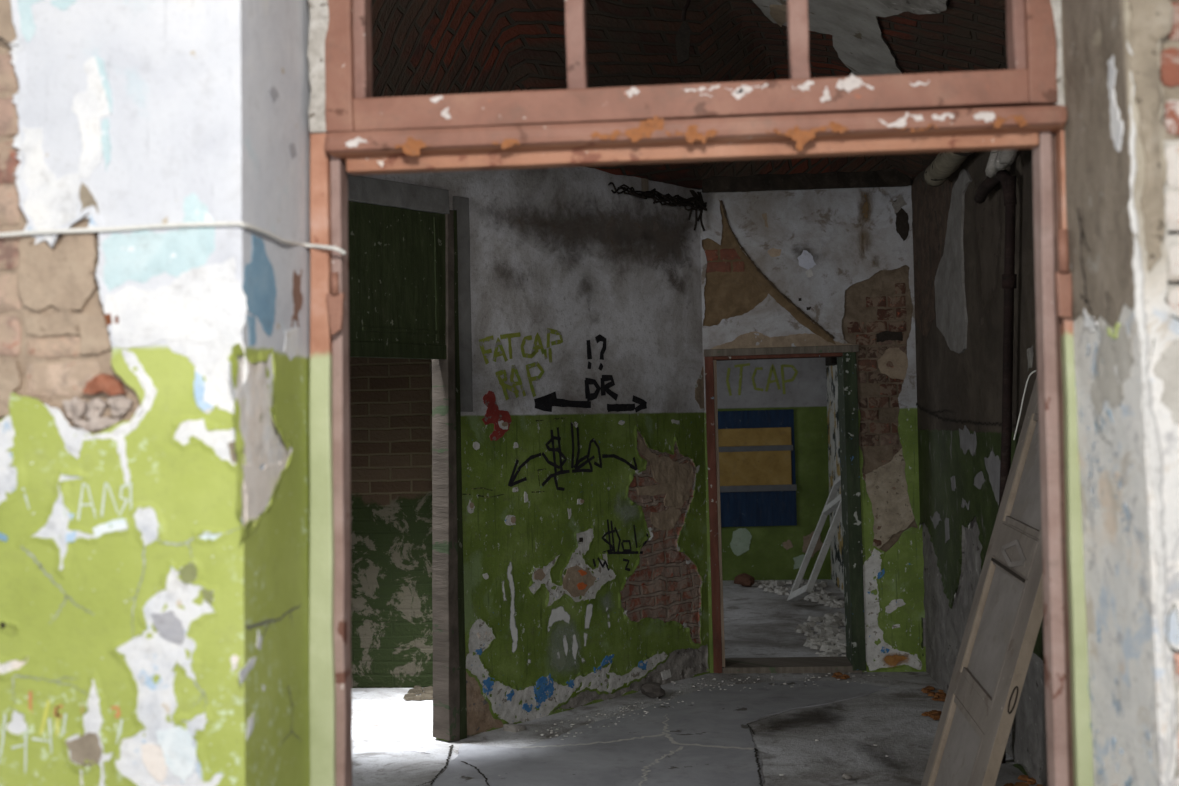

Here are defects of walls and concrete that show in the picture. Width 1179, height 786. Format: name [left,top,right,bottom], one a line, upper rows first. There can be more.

flaking render [1159,0,1179,320]
flaking render [0,0,169,581]
flaking render [702,178,984,692]
peeling [959,425,1000,506]
flaking render [1153,339,1179,424]
peeling [60,335,294,786]
flaking render [465,419,709,736]
peeling [0,652,32,683]
crack [411,745,490,786]
crack [521,703,816,786]
flaking render [1006,646,1048,786]